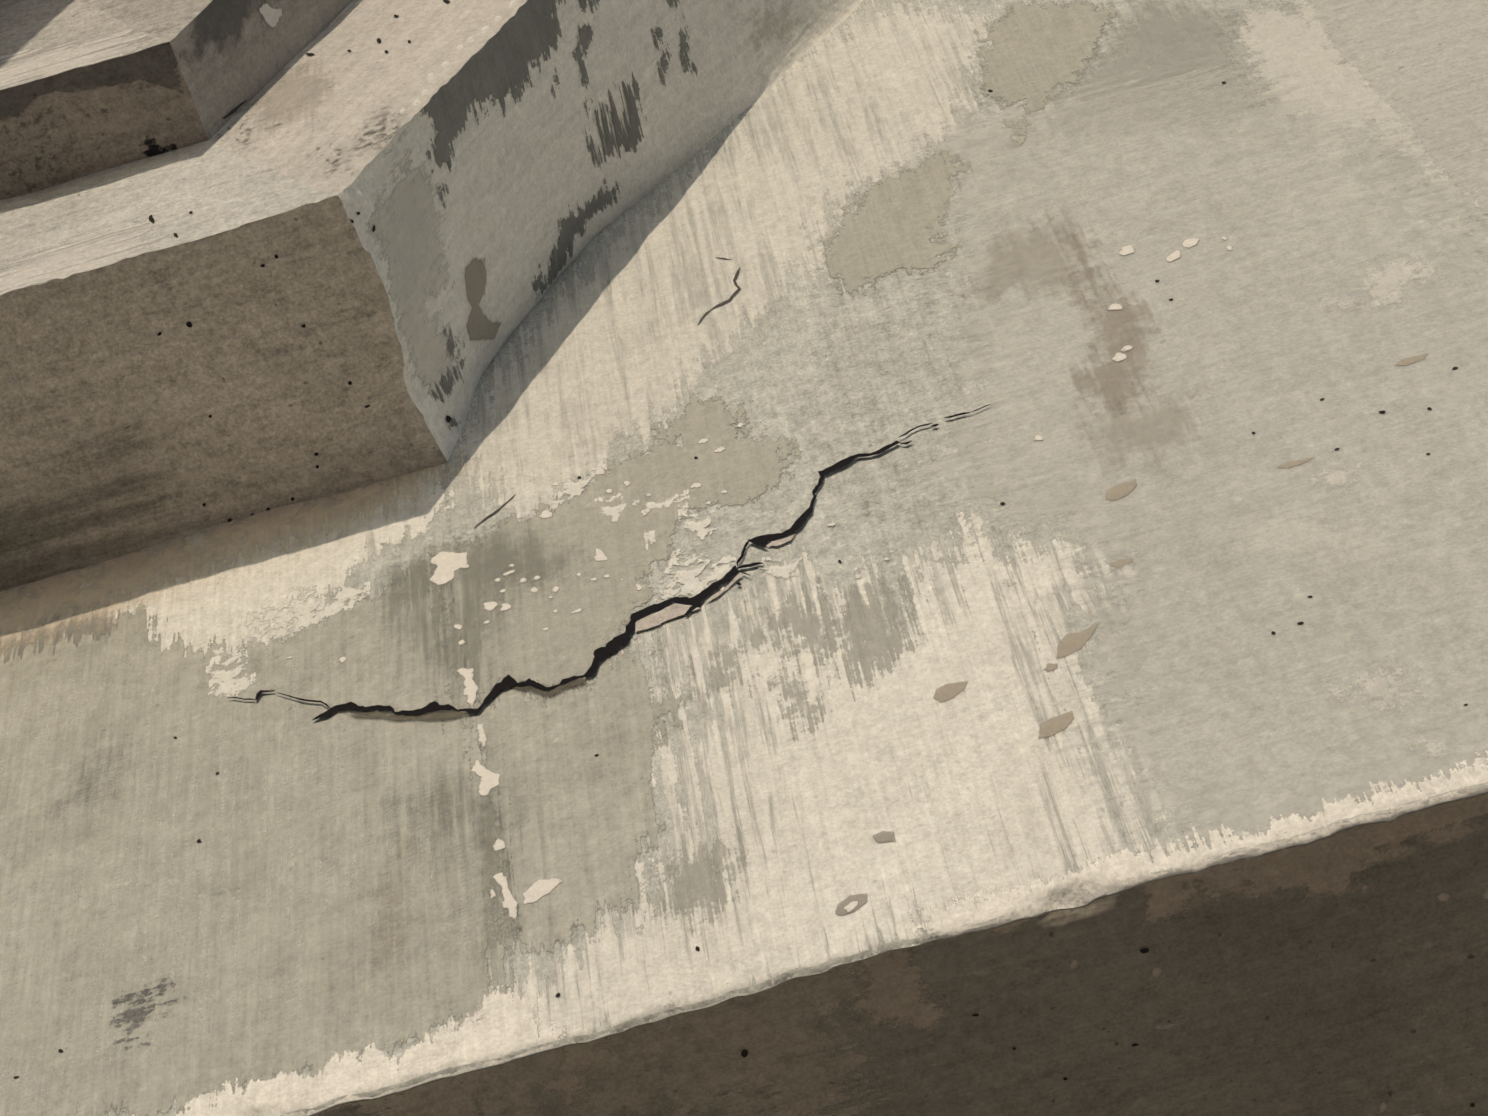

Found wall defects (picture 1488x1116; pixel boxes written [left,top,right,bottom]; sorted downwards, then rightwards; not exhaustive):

crack [229,404,991,720]